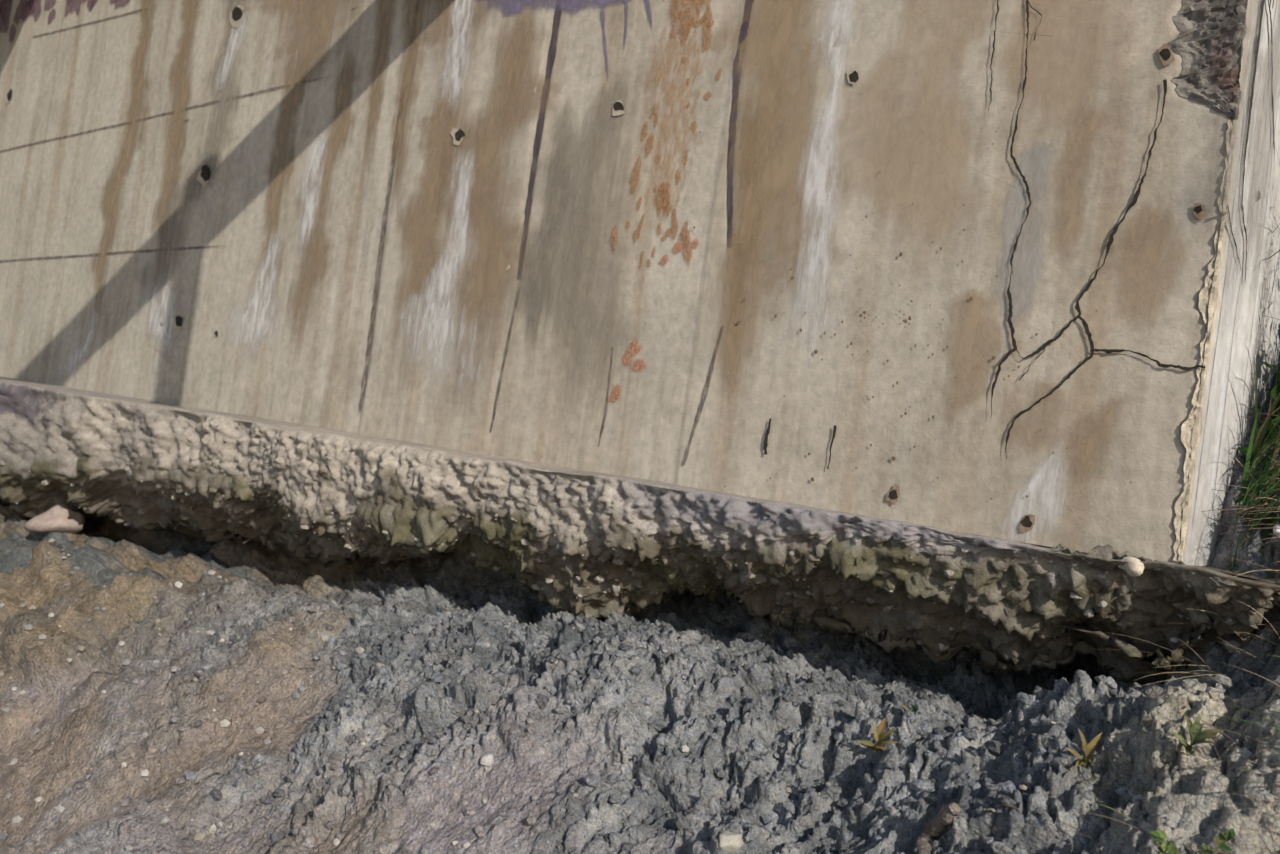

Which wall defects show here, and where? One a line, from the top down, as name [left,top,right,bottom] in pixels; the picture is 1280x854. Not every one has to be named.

damp [143,0,245,348]
damp [239,0,352,345]
spalling [209,483,536,572]
damp [368,0,621,369]
rust [622,340,646,371]
rust [611,0,722,267]
spalling [518,538,832,618]
damp [724,0,852,377]
crack [989,0,1205,459]
spalling [1070,592,1133,630]
spalling [1156,0,1280,670]
crack [1227,0,1275,280]